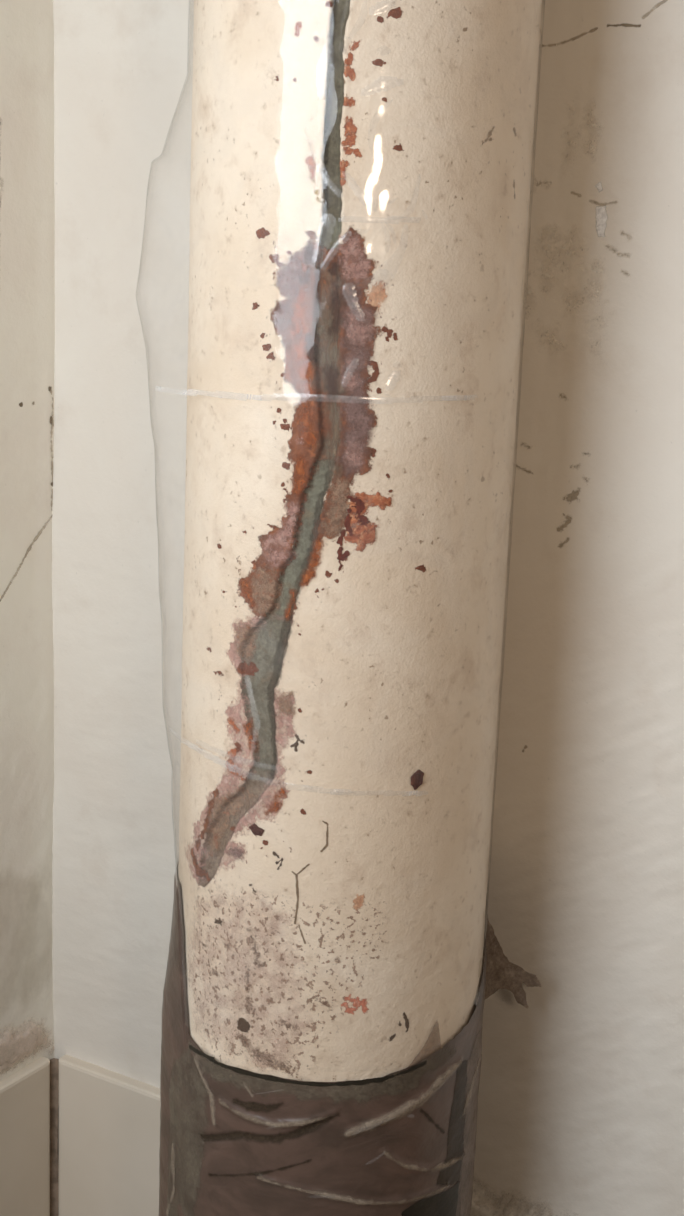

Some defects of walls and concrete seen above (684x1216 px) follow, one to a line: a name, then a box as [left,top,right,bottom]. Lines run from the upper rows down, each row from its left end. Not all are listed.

crack [539,0,667,47]
crack [0,387,53,601]
crack [198,0,350,887]
rust [184,226,398,883]
leakage [194,884,382,1076]
crack [292,821,328,944]